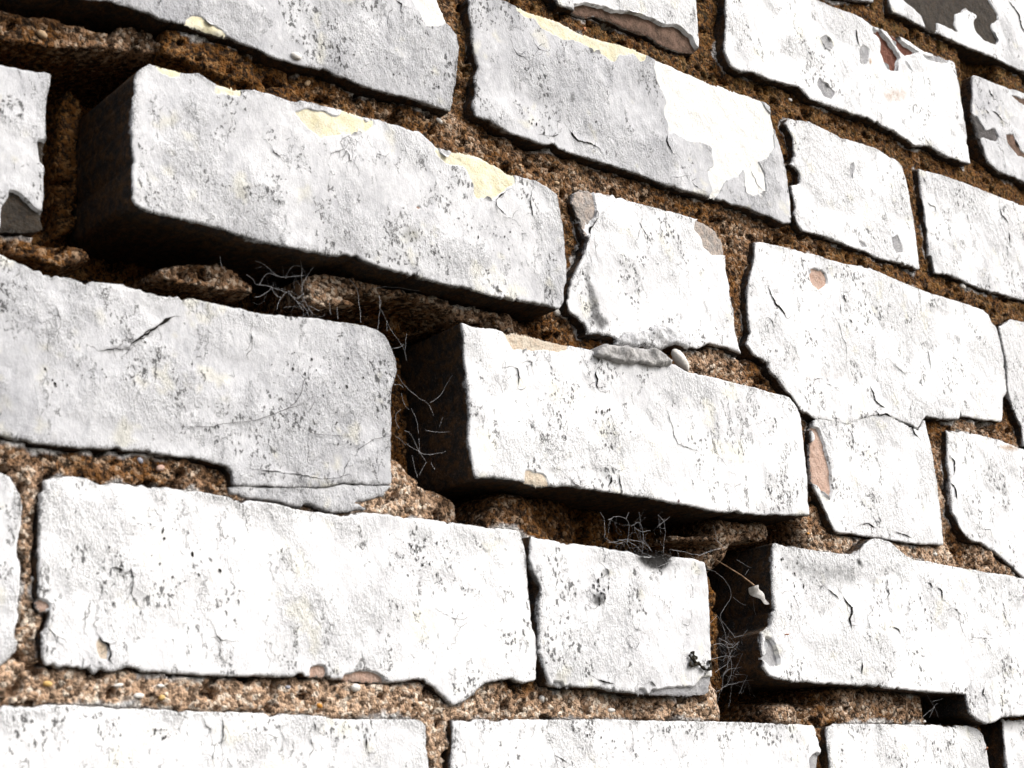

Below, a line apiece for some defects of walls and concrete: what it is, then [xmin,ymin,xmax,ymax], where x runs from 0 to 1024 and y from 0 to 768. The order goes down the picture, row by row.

peeling [904,0,999,45]
spalling [859,31,948,71]
peeling [295,109,373,138]
peeling [516,5,774,200]
peeling [435,147,515,201]
spalling [571,191,598,236]
crack [767,282,790,333]
crack [87,316,174,357]
crack [808,285,850,392]
crack [871,388,919,438]
crack [821,582,905,637]
crack [930,583,1012,671]